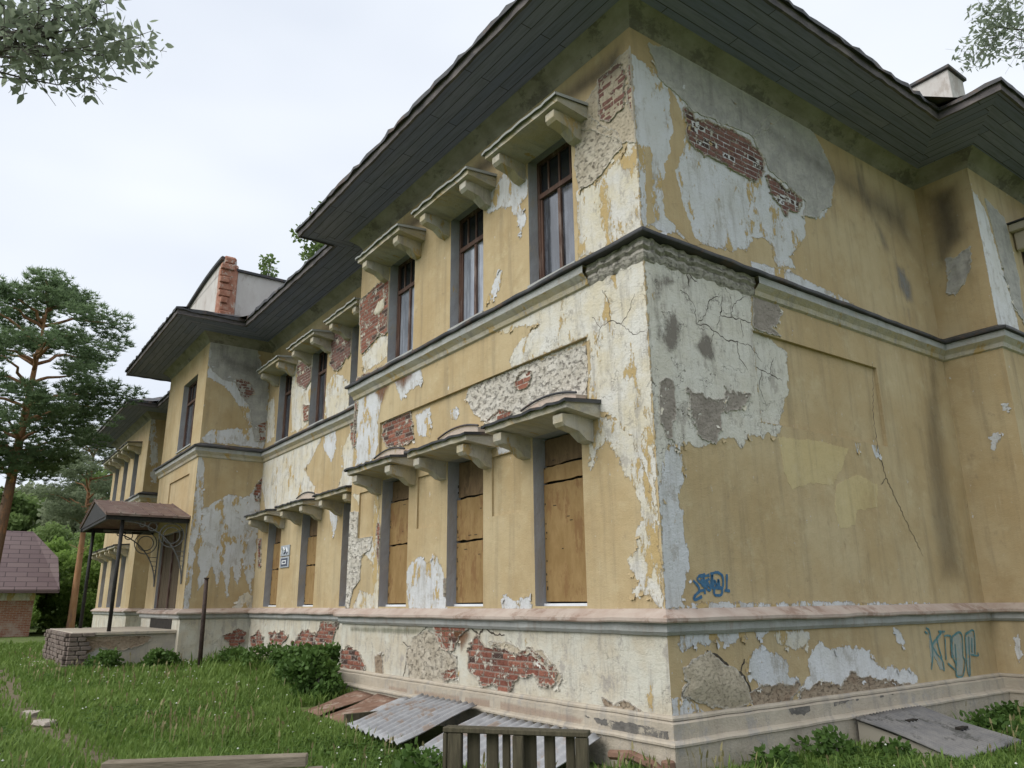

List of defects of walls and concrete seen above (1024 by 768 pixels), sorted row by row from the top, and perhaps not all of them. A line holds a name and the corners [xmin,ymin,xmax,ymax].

peeling [574,42,854,305]
peeling [944,188,1024,330]
crack [680,274,780,406]
peeling [183,280,433,609]
peeling [450,260,931,610]
flaking render [222,621,384,674]
flaking render [405,627,563,692]
peeling [677,627,918,716]